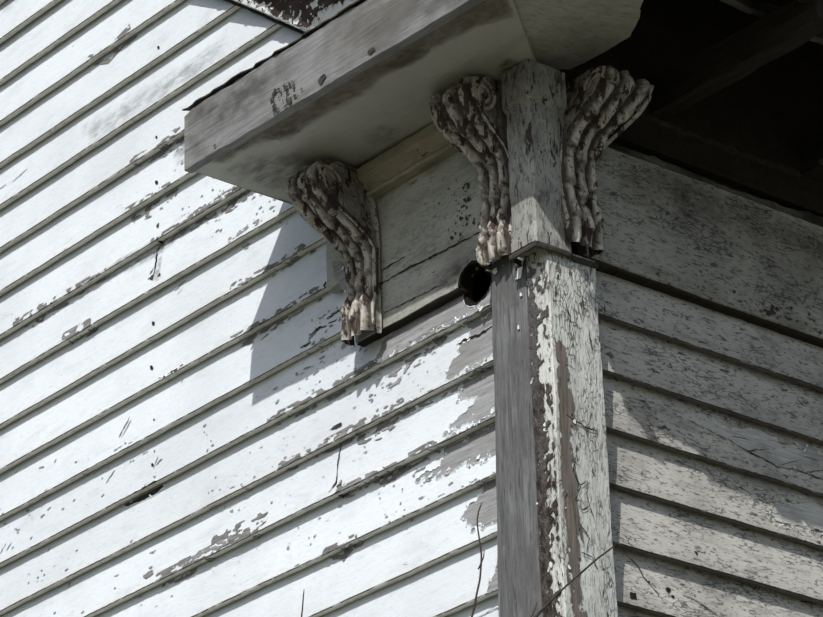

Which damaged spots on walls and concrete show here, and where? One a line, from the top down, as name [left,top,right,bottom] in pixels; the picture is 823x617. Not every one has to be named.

peeling [238,0,353,30]
crack [150,237,163,280]
spalling [230,244,316,289]
spalling [231,261,347,346]
peeling [266,265,503,534]
peeling [515,257,588,617]
spalling [143,501,273,587]
spalling [322,532,364,561]